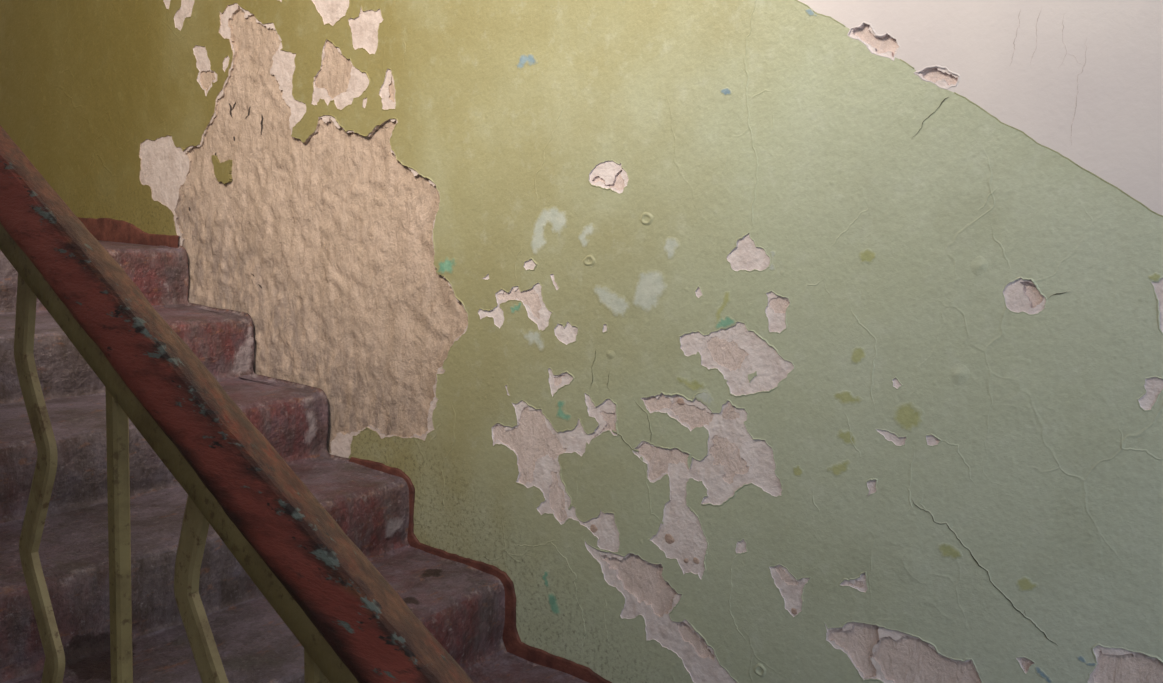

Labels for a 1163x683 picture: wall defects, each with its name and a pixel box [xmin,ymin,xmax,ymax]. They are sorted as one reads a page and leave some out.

spalling [847,21,901,61]
spalling [914,65,961,90]
peeling [588,160,630,194]
spalling [139,0,595,459]
peeling [726,232,771,272]
peeling [591,236,681,333]
peeling [1001,276,1047,316]
peeling [491,290,795,683]
peeling [768,564,811,618]
crack [911,498,1058,646]
spalling [824,621,983,683]
spalling [1086,644,1163,683]